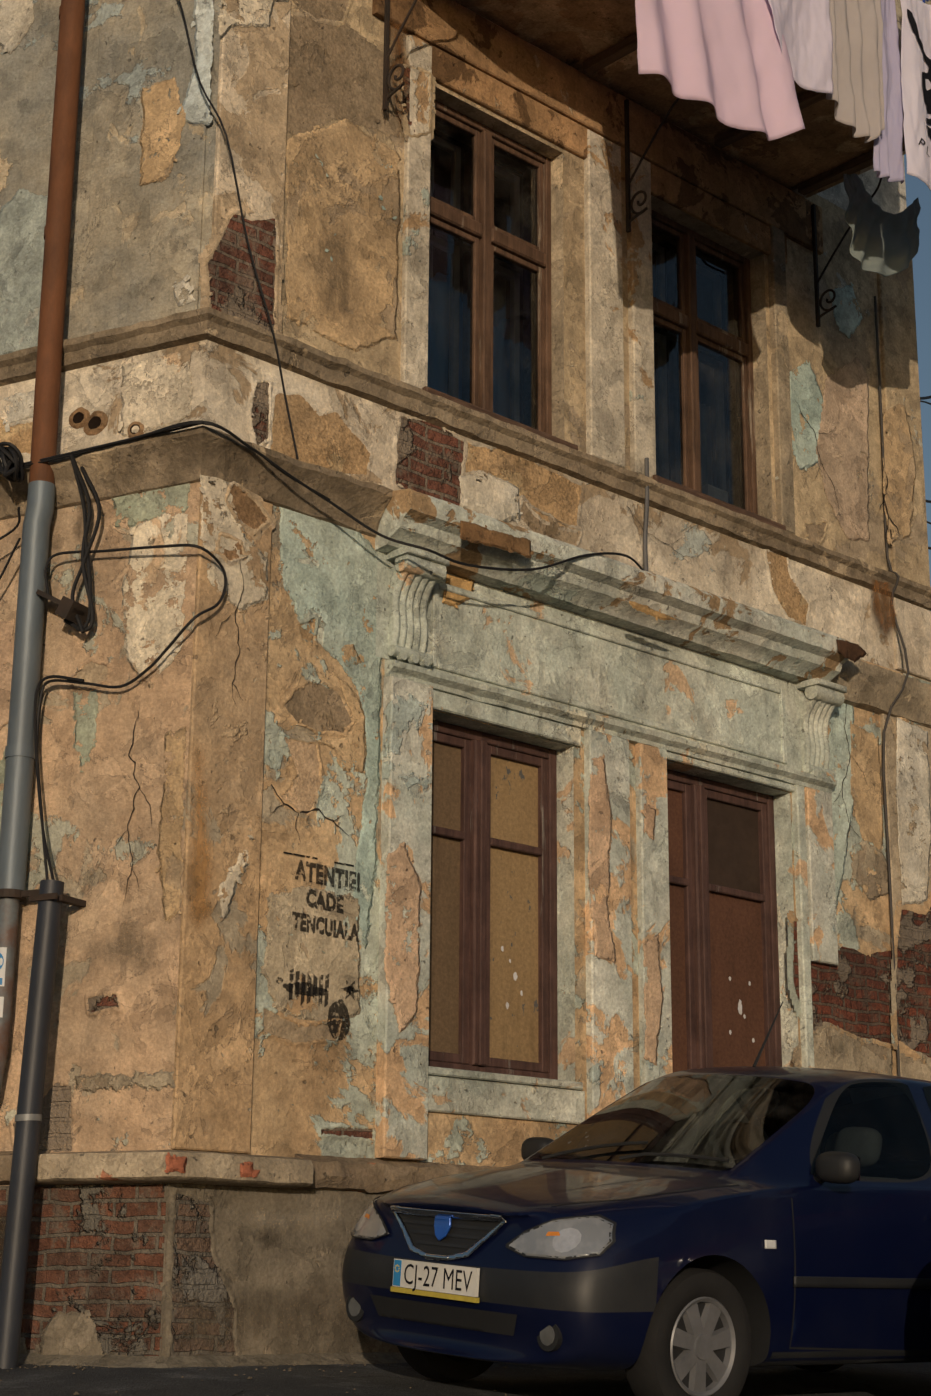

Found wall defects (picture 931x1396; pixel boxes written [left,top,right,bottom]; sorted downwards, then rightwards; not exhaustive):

peeling [0,0,35,54]
peeling [0,151,48,355]
peeling [139,0,436,352]
peeling [829,283,862,338]
spalling [246,376,375,481]
flaking render [390,412,585,558]
peeling [790,357,916,546]
crack [116,712,152,904]
peeling [68,475,423,1049]
flaking render [786,703,931,1068]
peeling [35,1310,104,1356]